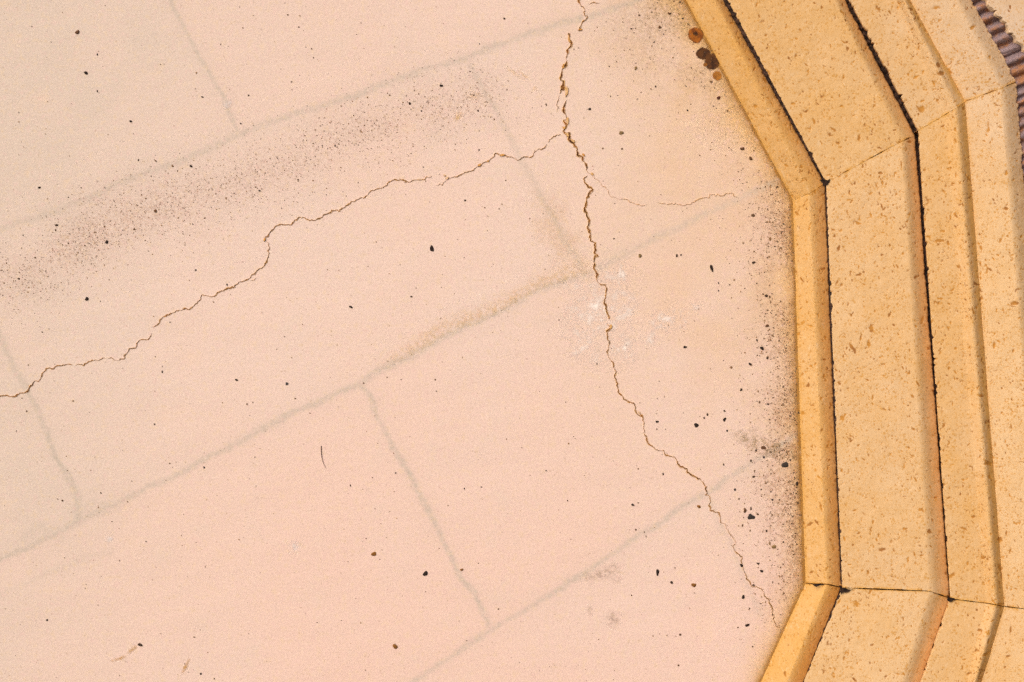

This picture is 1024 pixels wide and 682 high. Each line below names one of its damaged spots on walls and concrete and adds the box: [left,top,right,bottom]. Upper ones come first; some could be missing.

crack [0,0,781,632]
water stain [624,0,729,95]
corrosion [683,0,806,682]
water stain [725,136,803,647]